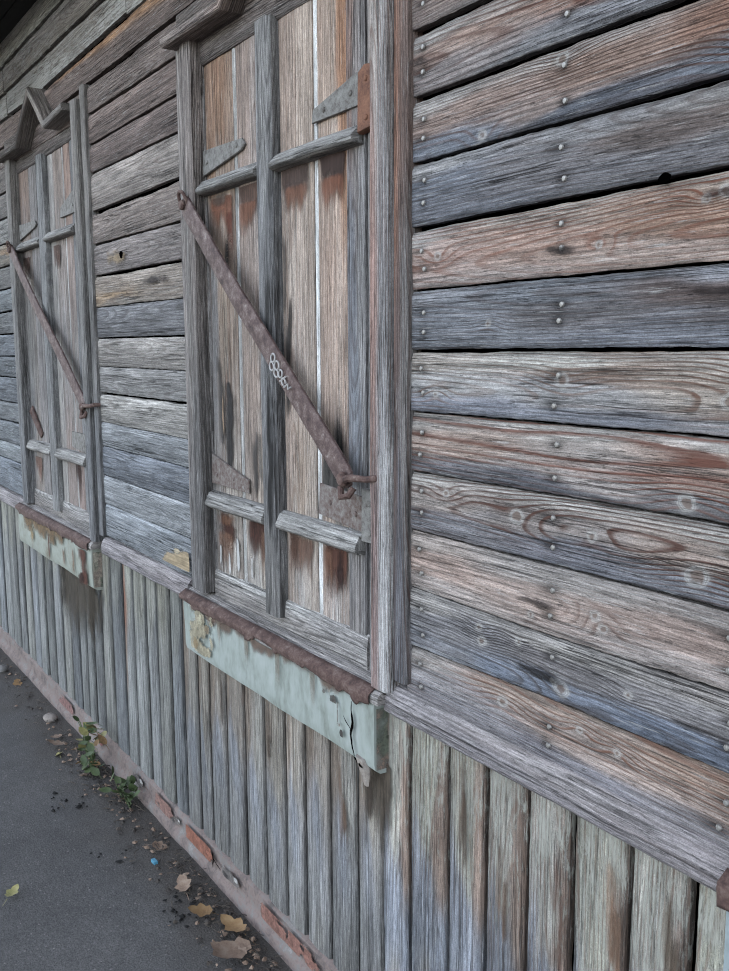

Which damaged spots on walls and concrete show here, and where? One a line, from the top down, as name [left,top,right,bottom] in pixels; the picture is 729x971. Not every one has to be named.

corrosion [211,182,257,247]
corrosion [205,615,308,671]
crack [343,701,363,768]
spalling [355,754,371,787]